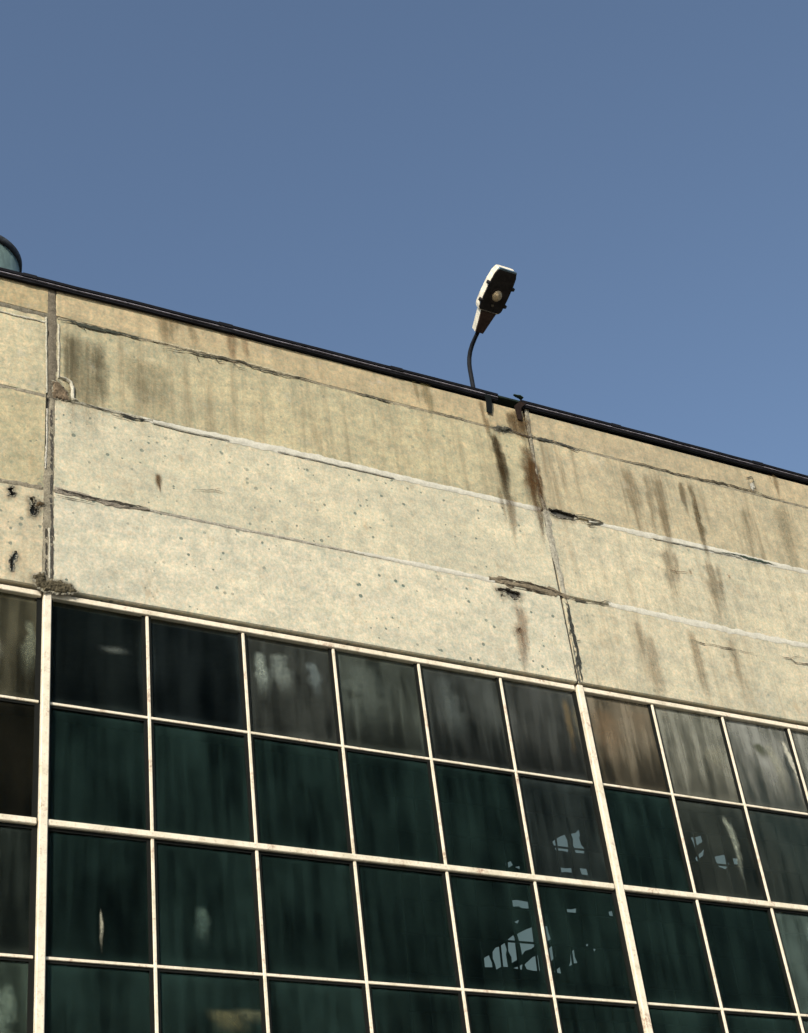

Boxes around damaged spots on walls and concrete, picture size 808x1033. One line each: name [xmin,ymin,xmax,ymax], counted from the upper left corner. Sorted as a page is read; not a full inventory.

crack [512,430,581,451]
corrosion [487,424,509,497]
corrosion [524,448,542,501]
spalling [6,485,46,517]
spalling [548,508,579,521]
spalling [8,550,19,572]
spalling [495,587,520,600]